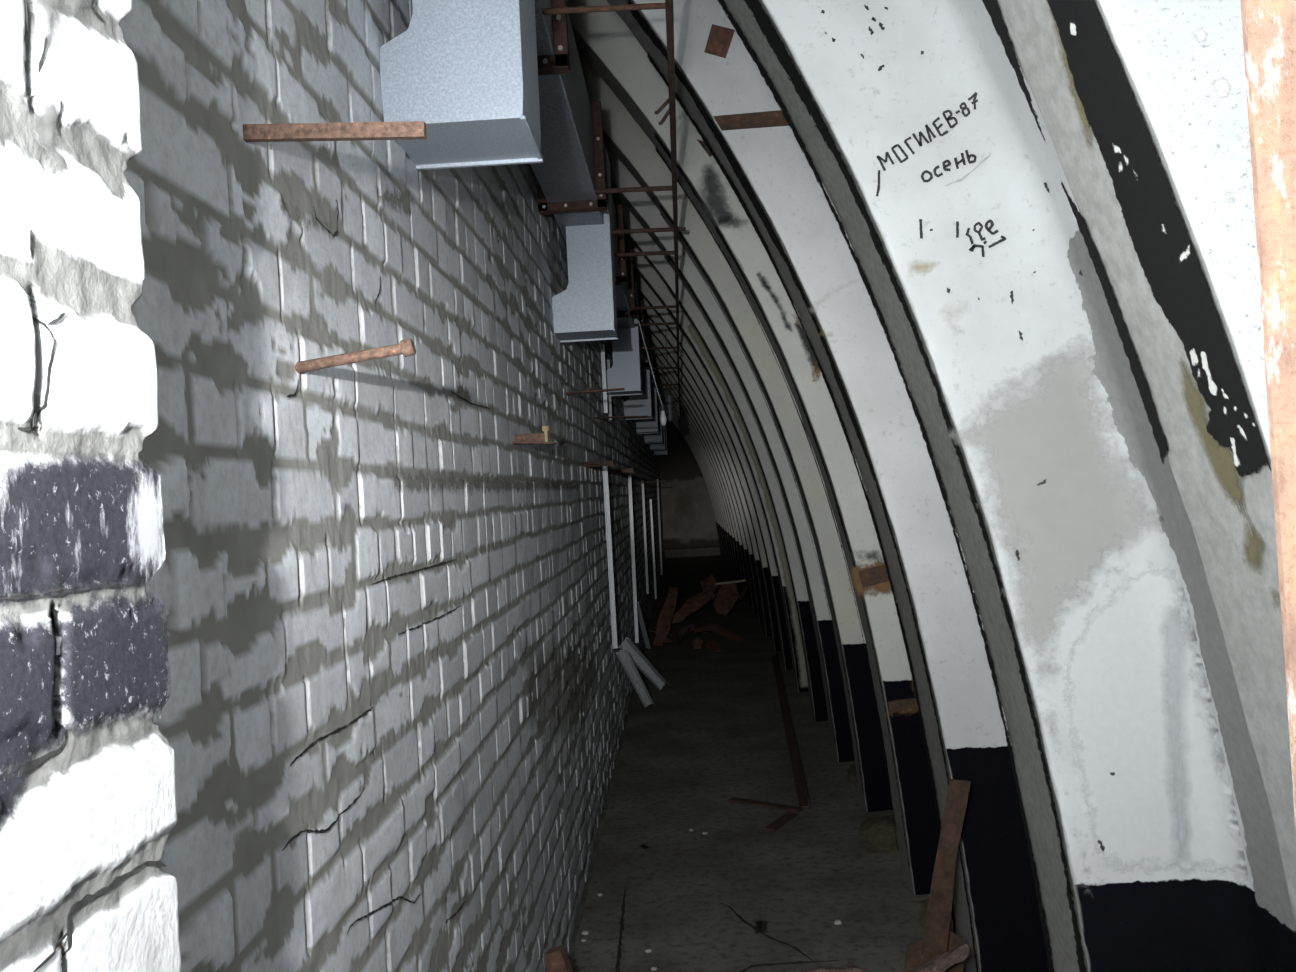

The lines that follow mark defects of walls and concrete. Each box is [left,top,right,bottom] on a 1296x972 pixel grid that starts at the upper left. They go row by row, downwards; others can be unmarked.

peeling [982,0,1046,143]
peeling [1047,0,1271,477]
crack [18,289,66,431]
peeling [1044,181,1296,932]
crack [290,707,373,766]
crack [282,787,365,851]